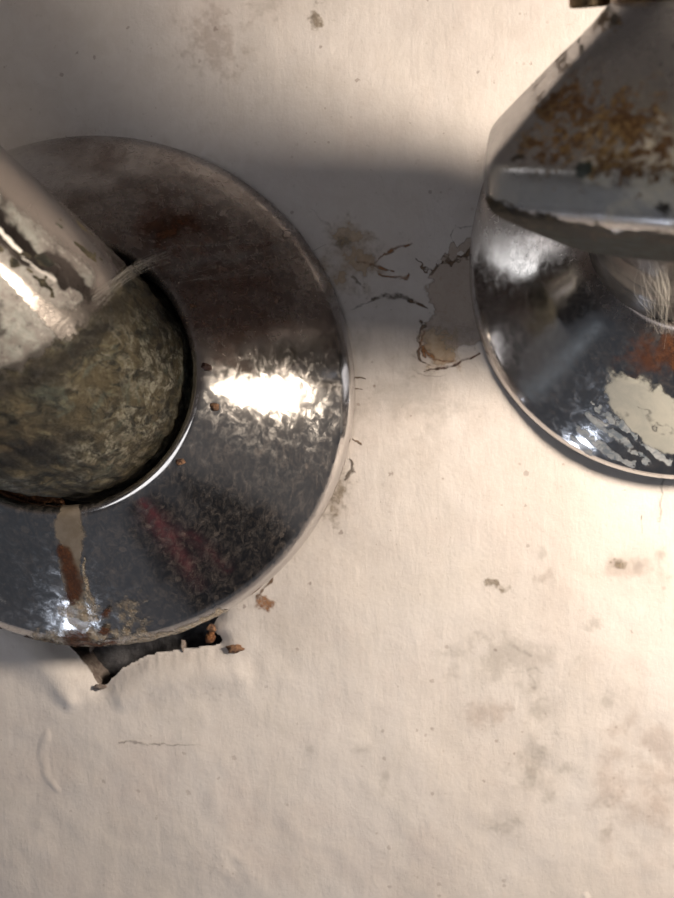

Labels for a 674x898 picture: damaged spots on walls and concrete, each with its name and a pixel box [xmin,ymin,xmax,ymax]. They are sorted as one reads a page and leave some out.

crack [372,294,427,308]
peeling [416,238,480,363]
flaking render [70,616,245,690]